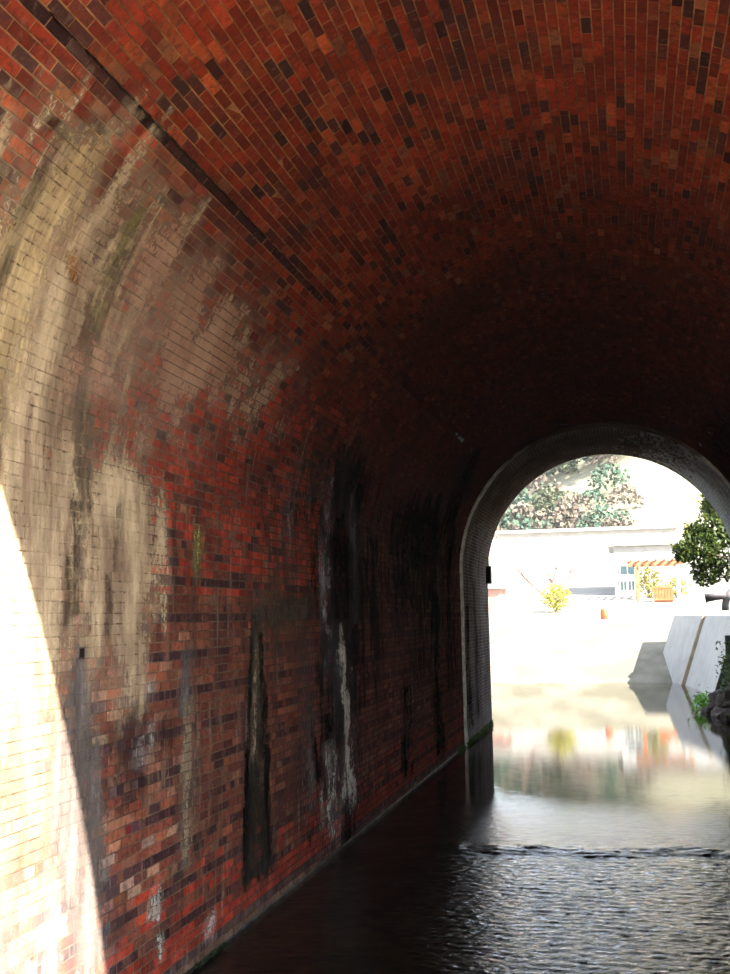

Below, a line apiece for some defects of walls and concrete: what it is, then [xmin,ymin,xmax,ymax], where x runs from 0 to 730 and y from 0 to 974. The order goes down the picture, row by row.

damp [0,95,300,972]
damp [242,430,484,892]